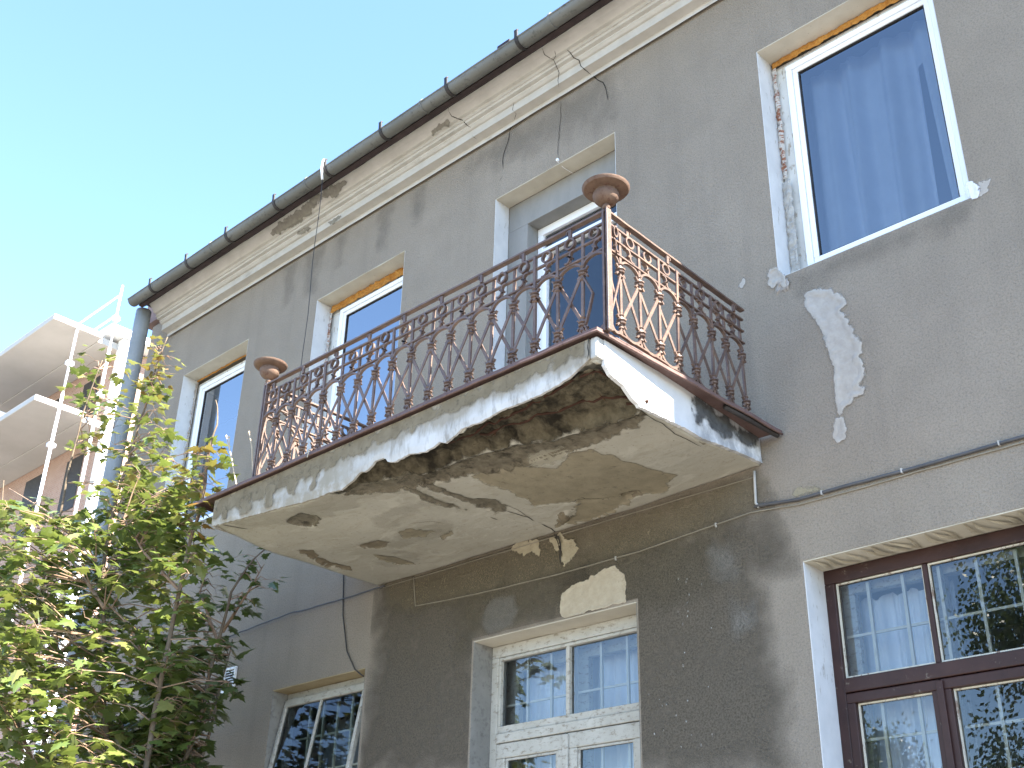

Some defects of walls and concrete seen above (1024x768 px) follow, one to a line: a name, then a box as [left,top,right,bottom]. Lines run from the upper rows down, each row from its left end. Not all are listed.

crack [543,51,608,141]
flaking render [771,68,787,180]
peeling [270,181,347,236]
peeling [965,178,991,199]
flaking render [767,267,789,295]
peeling [833,417,847,443]
spalling [330,368,677,566]
spalling [297,550,352,571]
flaking render [560,566,626,618]